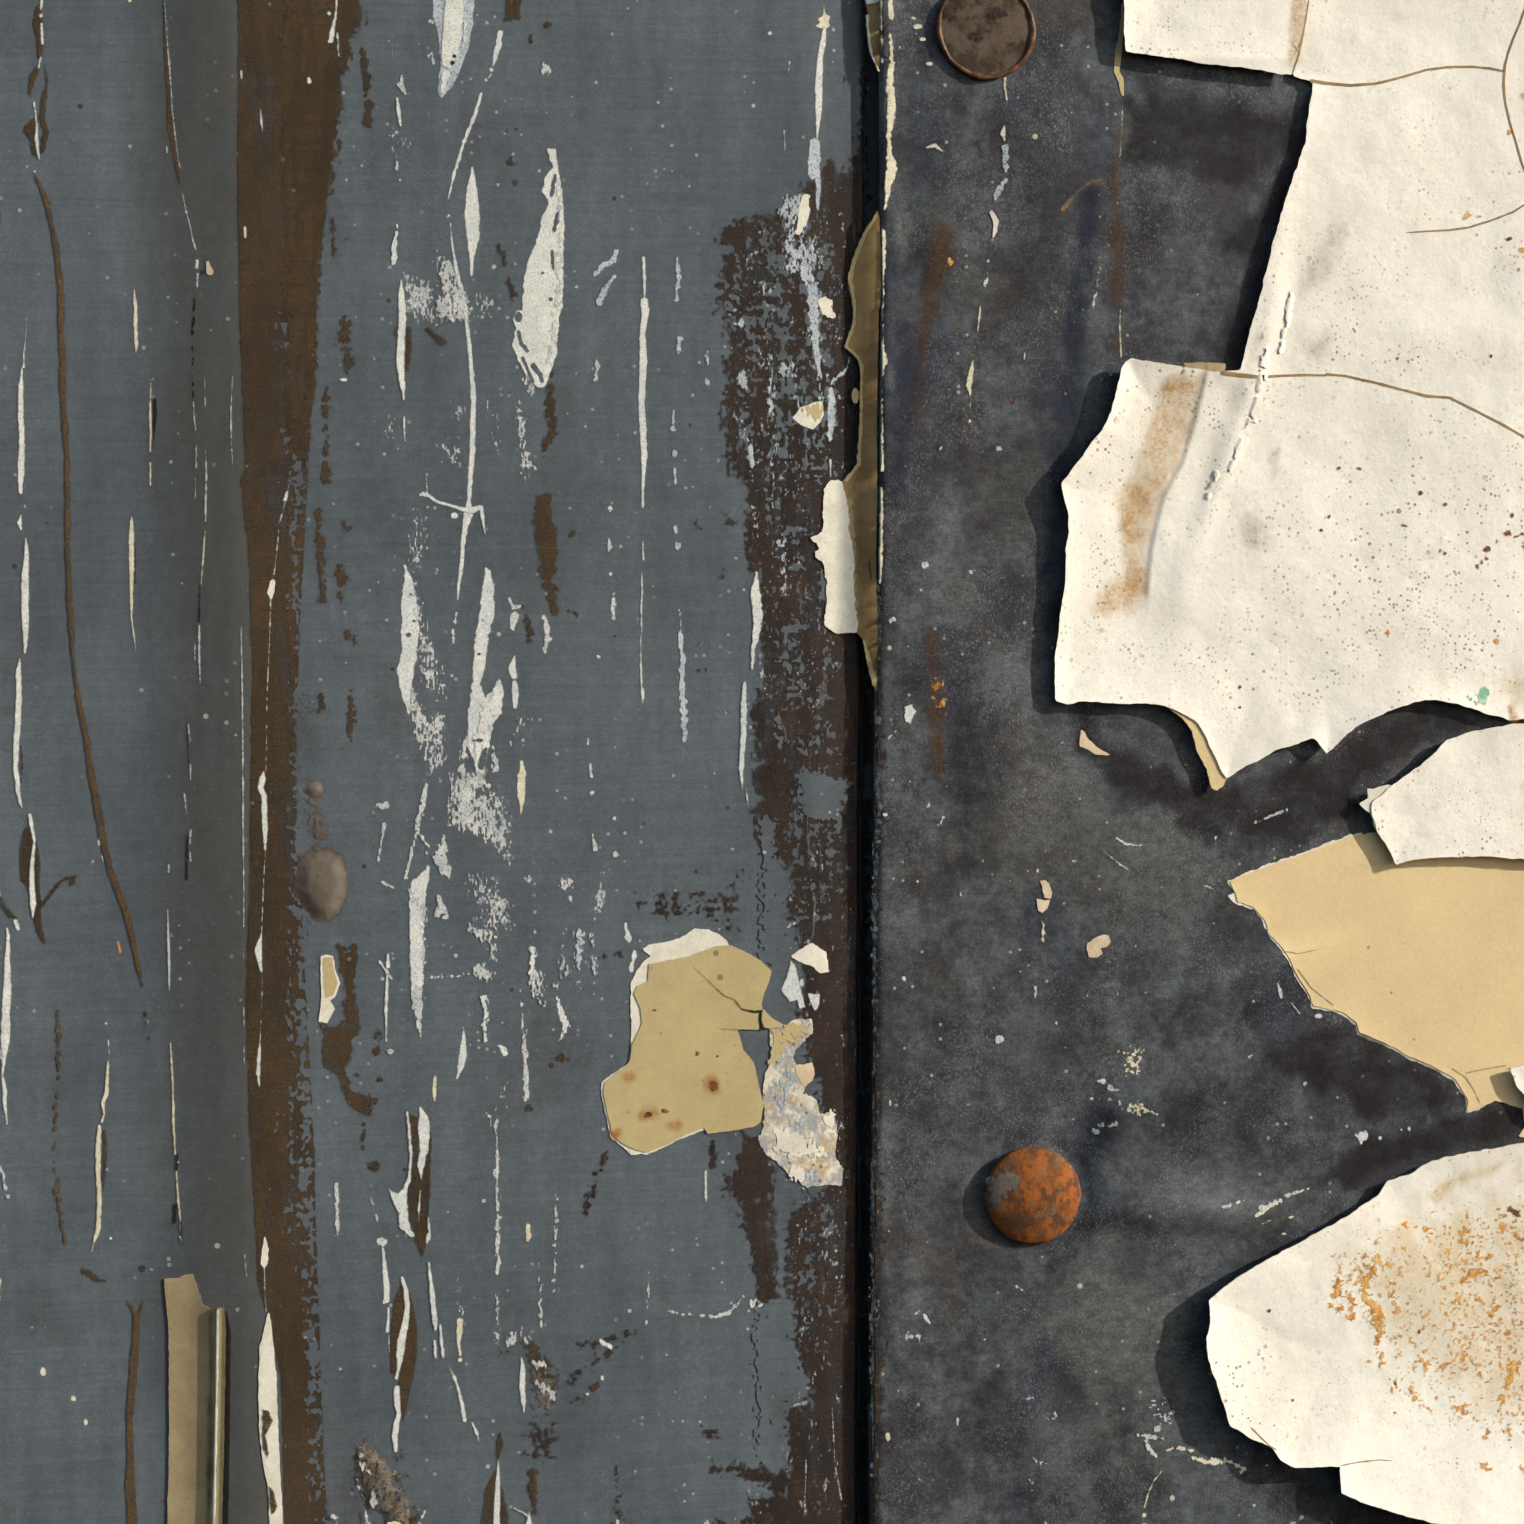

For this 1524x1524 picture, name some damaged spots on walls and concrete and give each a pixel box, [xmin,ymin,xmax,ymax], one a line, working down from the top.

peeling [504,0,521,22]
crack [1292,0,1524,233]
spalling [498,174,564,383]
peeling [1054,0,1524,865]
crack [1221,371,1524,438]
peeling [583,61,916,1524]
peeling [1510,1065,1524,1095]
peeling [164,1274,231,1524]
peeling [1206,1143,1524,1524]
corrosion [1328,1206,1524,1441]